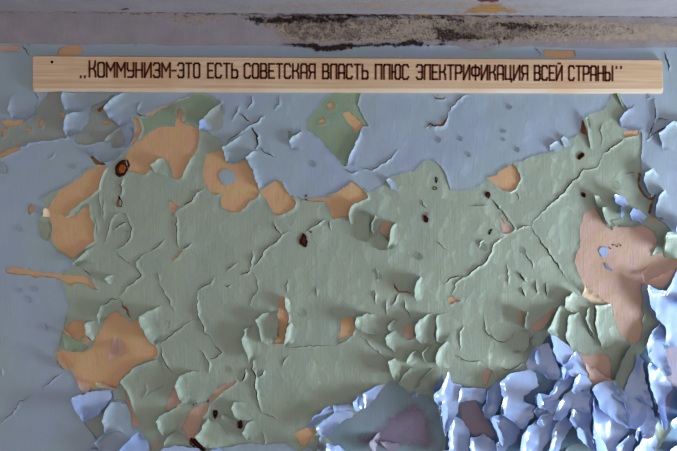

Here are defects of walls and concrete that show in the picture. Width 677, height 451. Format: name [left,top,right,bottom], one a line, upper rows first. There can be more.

water stain [246,15,677,52]
crack [423,93,470,132]
crack [343,149,399,176]
crack [442,122,626,299]
crack [93,178,333,401]
peeling [0,91,677,451]
crack [371,268,413,319]
crack [433,313,525,372]
crack [582,304,597,341]
crack [240,335,388,444]